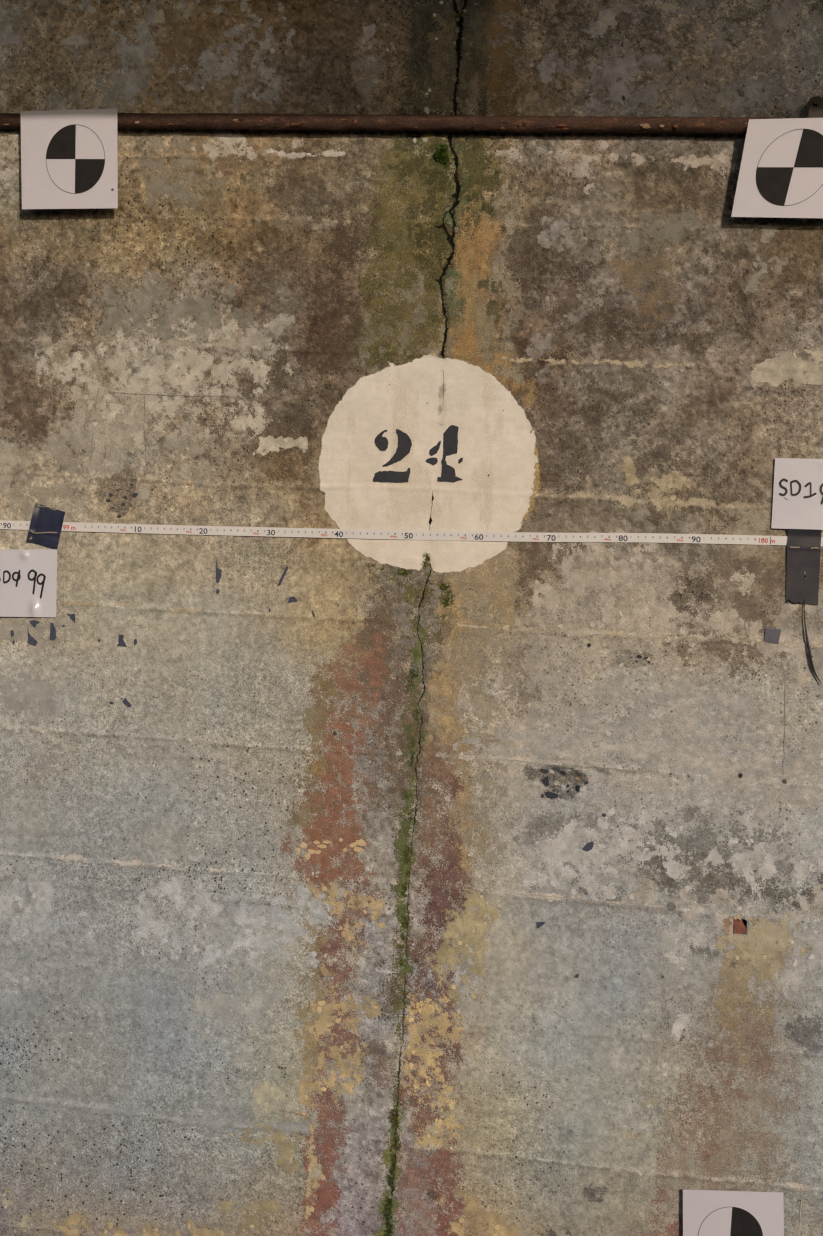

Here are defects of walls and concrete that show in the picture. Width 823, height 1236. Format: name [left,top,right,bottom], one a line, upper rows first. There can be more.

crack [435,0,467,400]
crack [388,565,660,1232]